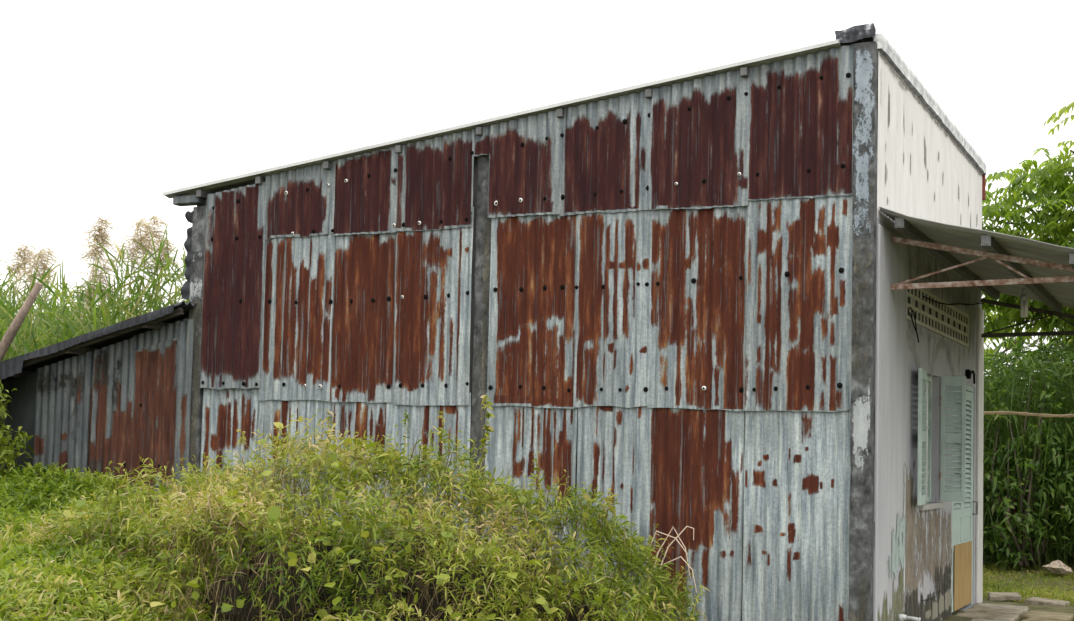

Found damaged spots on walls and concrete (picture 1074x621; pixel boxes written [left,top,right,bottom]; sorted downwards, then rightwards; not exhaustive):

rust [201,57,853,612]
rust [59,433,68,473]
rust [77,340,187,487]
peeling [852,378,871,470]
leakage [849,563,952,621]